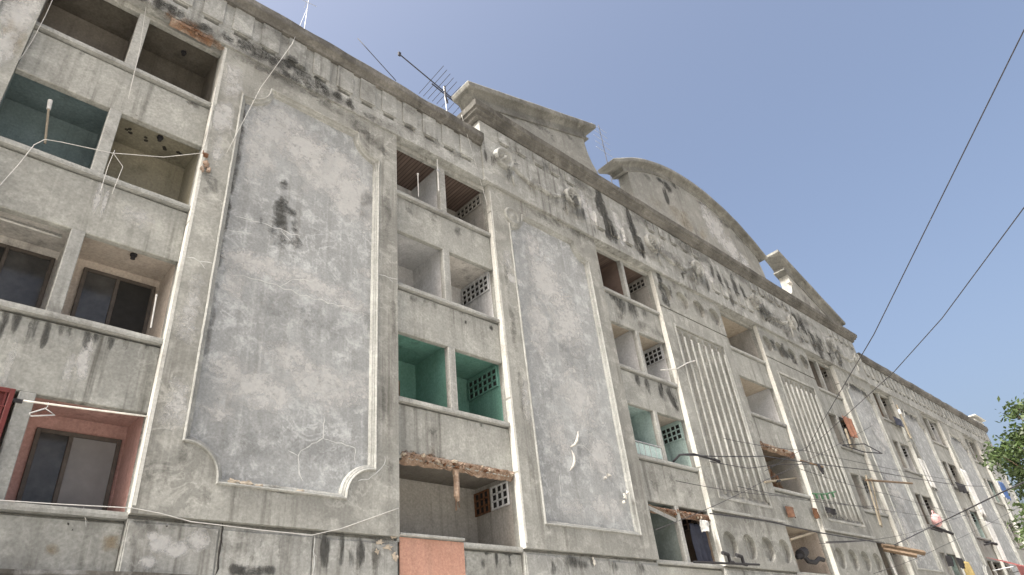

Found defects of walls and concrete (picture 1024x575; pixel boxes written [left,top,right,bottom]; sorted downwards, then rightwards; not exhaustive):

leakage [212,104,373,228]
leakage [272,198,299,242]
leakage [564,182,675,259]
leakage [681,203,843,366]
leakage [0,312,51,347]
leakage [77,331,114,375]
crack [289,418,356,481]
peeling [410,452,514,477]